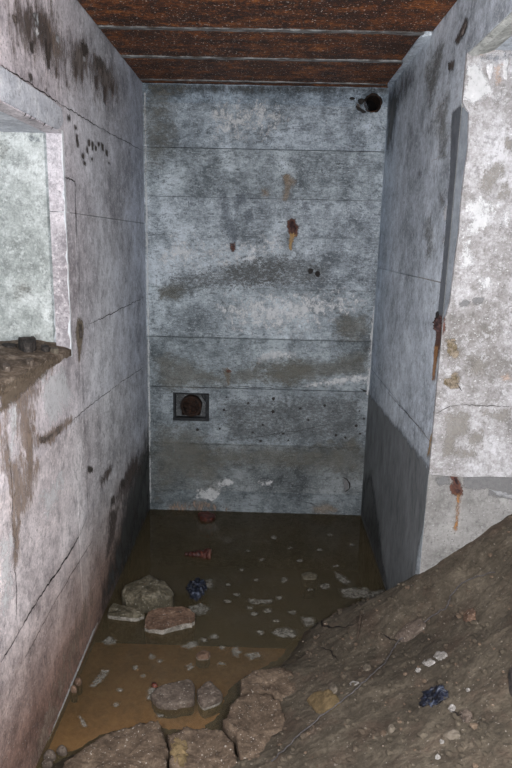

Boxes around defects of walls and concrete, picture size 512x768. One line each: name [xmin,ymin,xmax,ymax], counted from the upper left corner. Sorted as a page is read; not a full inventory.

damp [8,0,118,105]
corrosion [287,218,299,250]
damp [159,235,367,340]
corrosion [432,311,446,381]
damp [0,357,73,614]
damp [102,430,150,608]
corrosion [449,476,463,530]